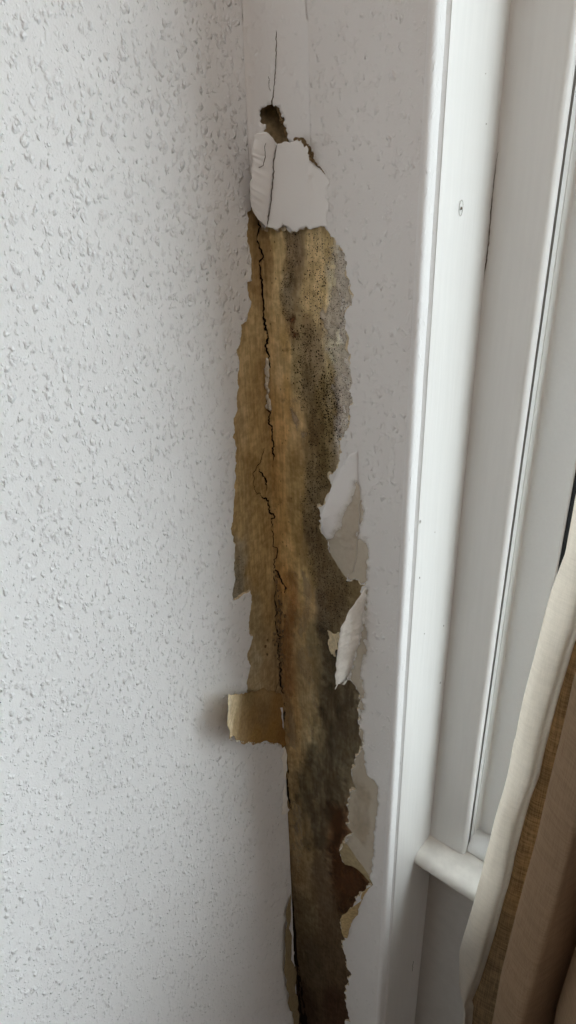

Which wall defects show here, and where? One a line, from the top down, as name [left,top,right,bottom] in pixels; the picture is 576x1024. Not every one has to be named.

crack [268,32,277,103]
spalling [260,104,289,144]
crack [257,143,277,368]
crack [253,401,287,721]
leakage [280,230,378,877]
crack [284,748,292,808]
crack [292,901,308,1024]